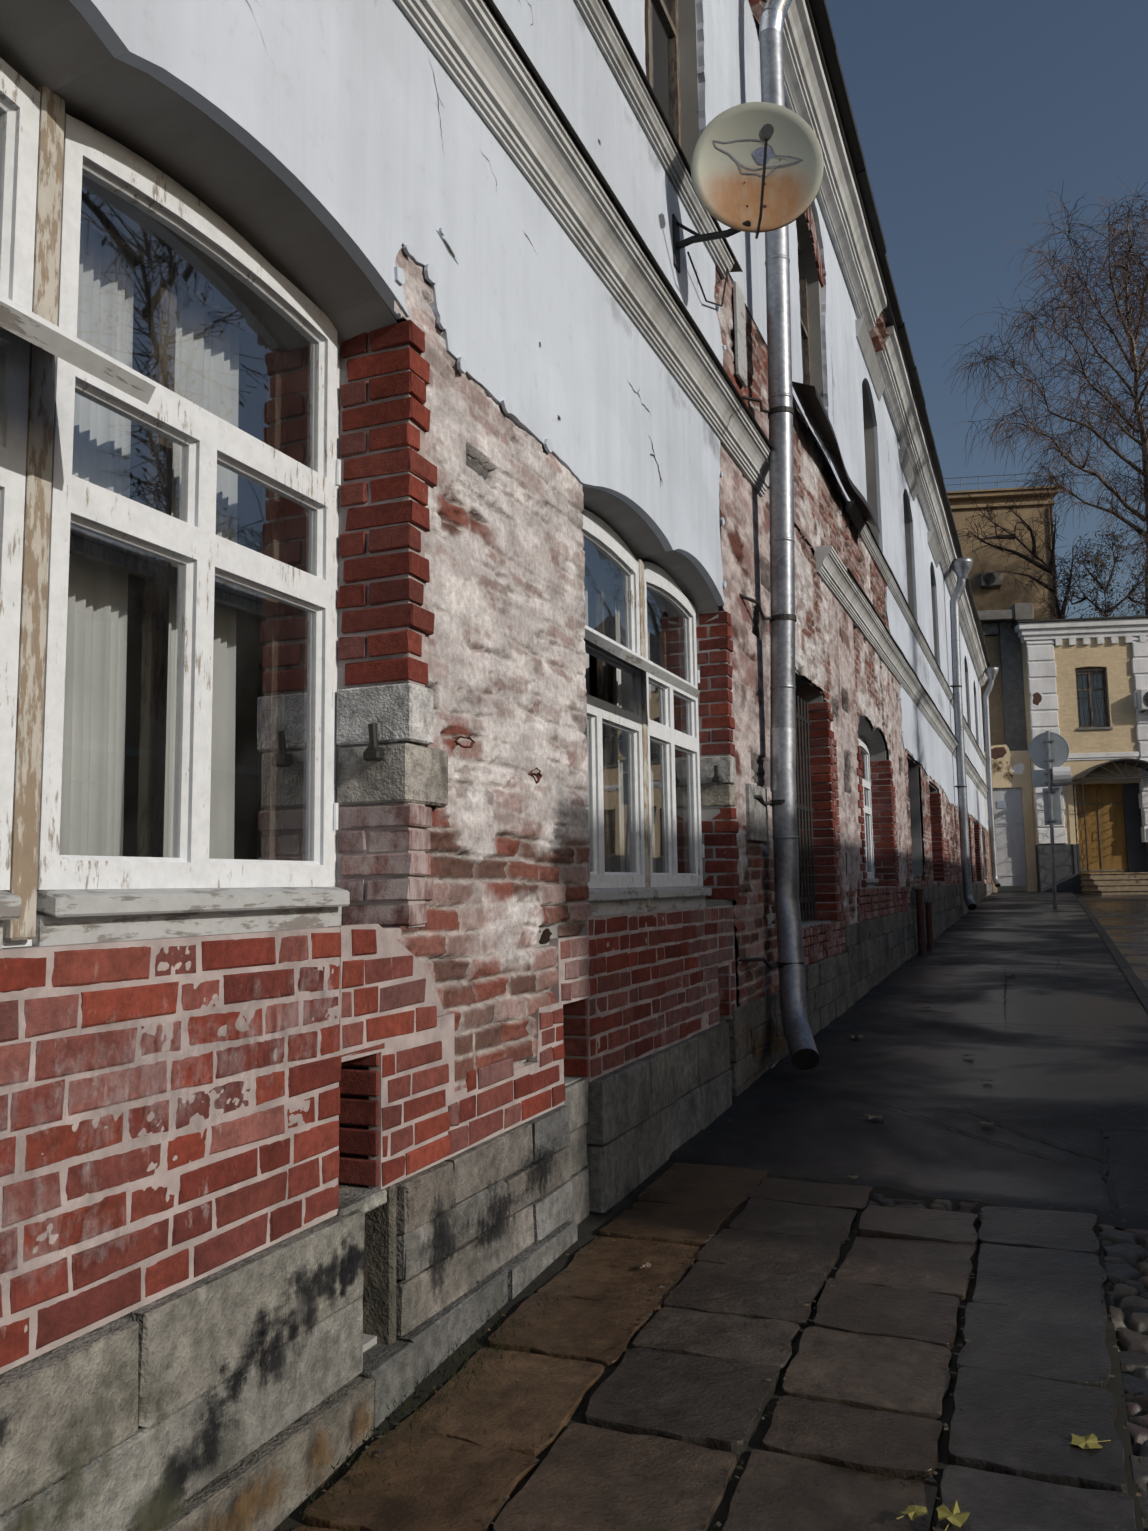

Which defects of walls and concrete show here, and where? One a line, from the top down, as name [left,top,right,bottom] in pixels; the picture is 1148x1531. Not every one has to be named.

spalling [436,227,458,264]
peeling [714,268,769,440]
peeling [393,245,591,1092]
peeling [719,443,779,1006]
peeling [793,398,991,963]
leakage [421,1146,556,1294]
leakage [135,1240,371,1531]